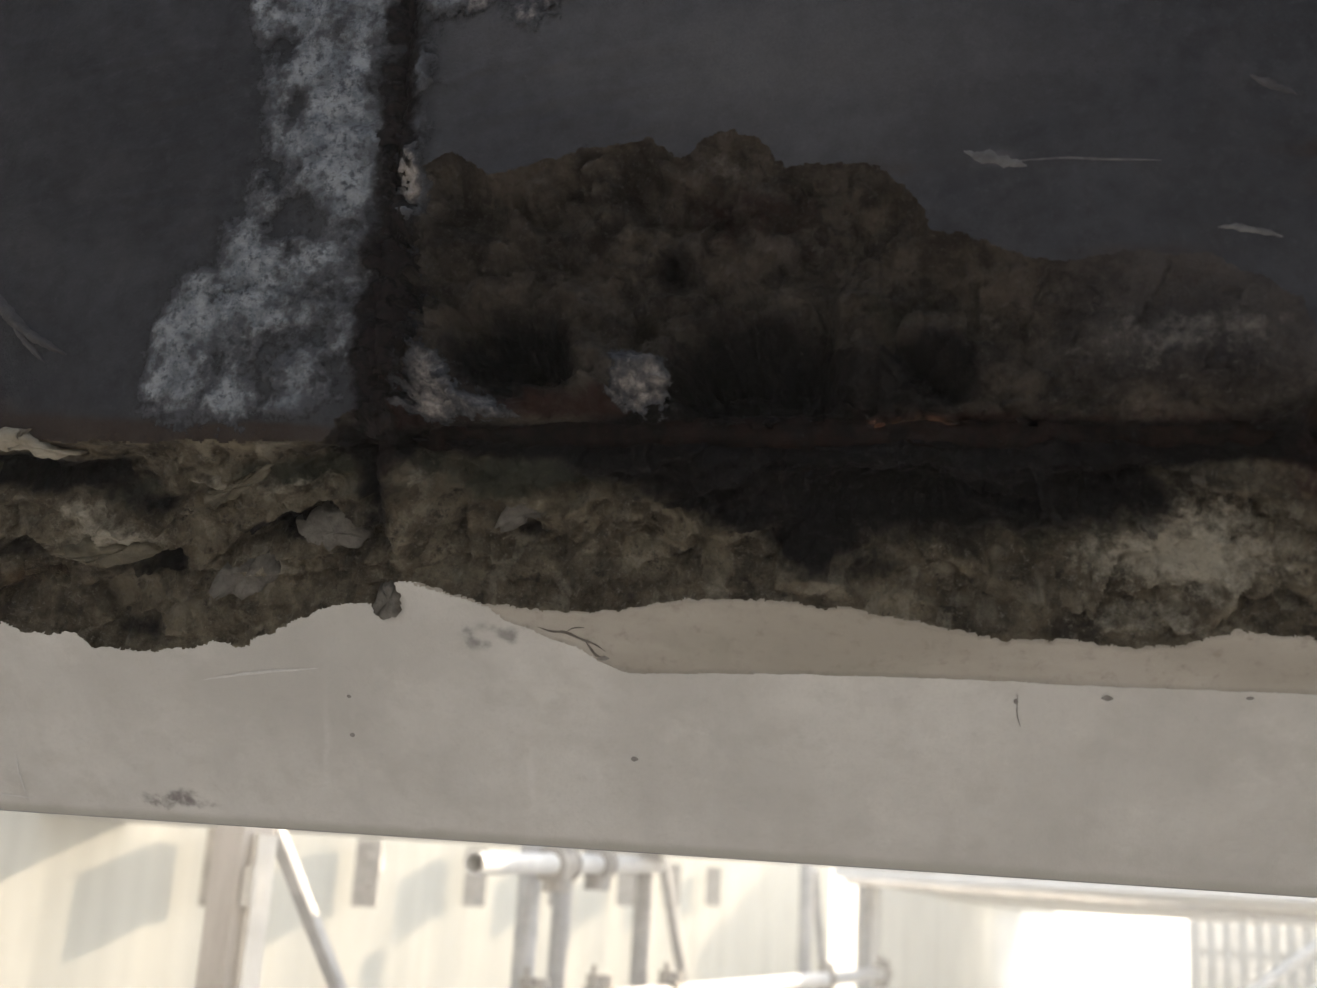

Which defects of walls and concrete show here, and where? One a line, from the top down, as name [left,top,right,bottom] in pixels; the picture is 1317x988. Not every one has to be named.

water stain [19,0,562,443]
spalling [0,129,1317,701]
crack [538,627,605,657]